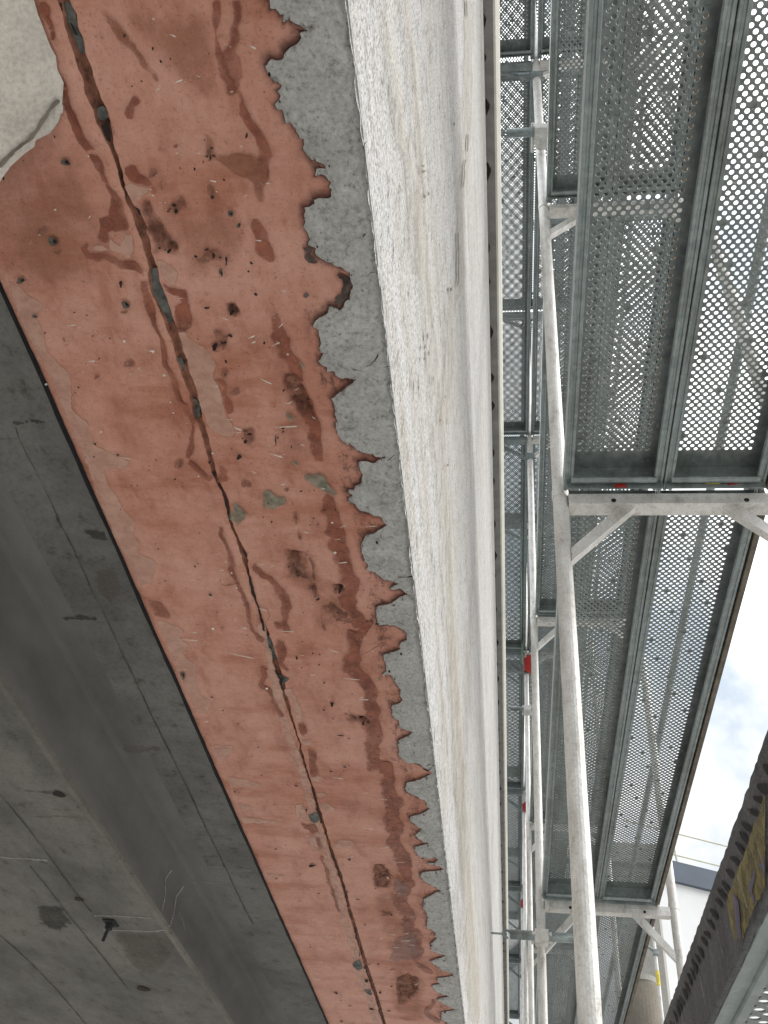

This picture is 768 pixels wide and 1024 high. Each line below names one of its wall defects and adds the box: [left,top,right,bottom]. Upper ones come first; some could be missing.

corrosion [216,0,272,201]
spalling [125,183,178,285]
peeling [9,282,156,586]
peeling [179,330,253,444]
corrosion [271,320,323,461]
crack [41,482,90,587]
crack [57,0,391,1024]
peeling [257,0,466,1024]
peeling [157,621,210,714]
corrosion [321,495,433,974]
corrosion [301,824,340,912]